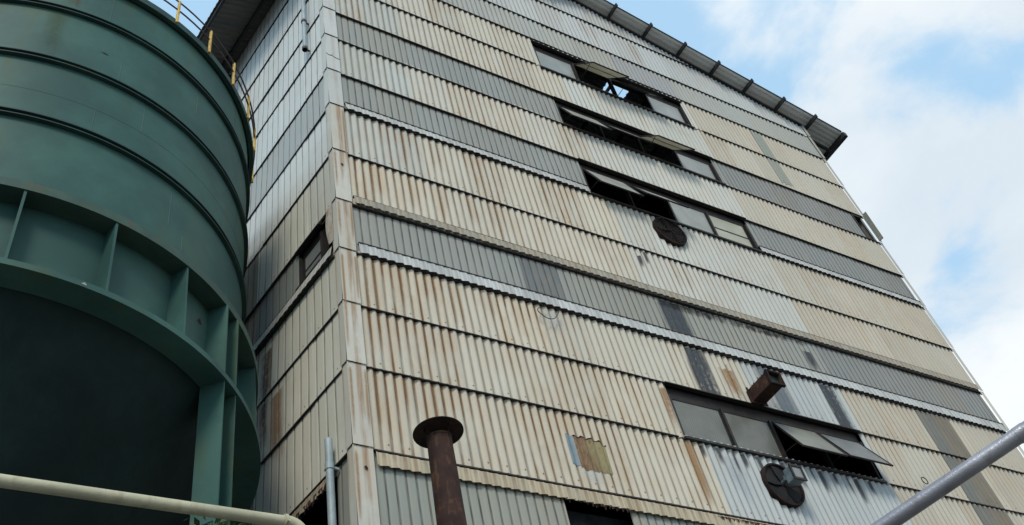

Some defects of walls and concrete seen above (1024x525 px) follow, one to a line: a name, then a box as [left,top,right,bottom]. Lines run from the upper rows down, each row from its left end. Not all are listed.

rust [341,254,377,318]
rust [261,349,281,445]
rust [685,443,707,490]